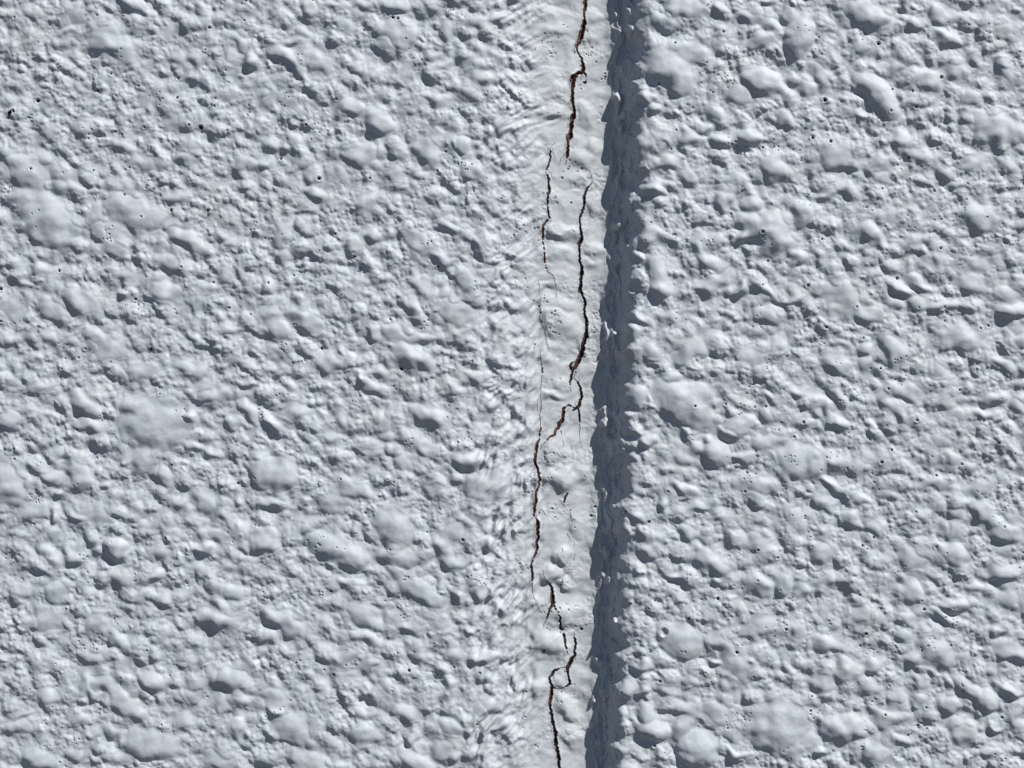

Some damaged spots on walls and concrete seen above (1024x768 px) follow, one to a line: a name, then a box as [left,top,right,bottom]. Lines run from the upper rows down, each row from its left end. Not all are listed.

crack [530,0,593,768]